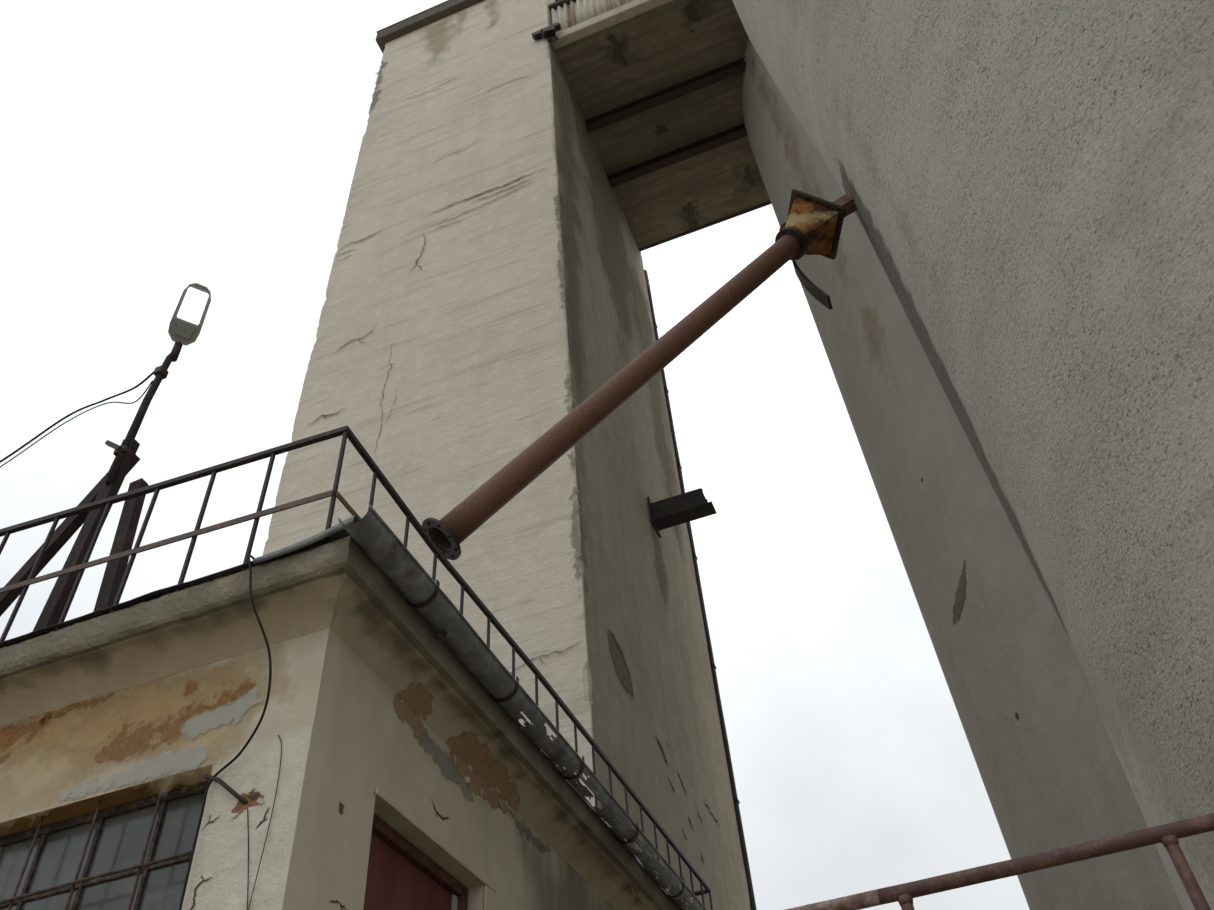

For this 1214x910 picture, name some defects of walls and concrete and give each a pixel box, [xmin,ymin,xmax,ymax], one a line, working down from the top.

crack [336,328,396,463]
spalling [230,786,264,819]
peeling [394,682,550,853]
crack [190,875,213,910]